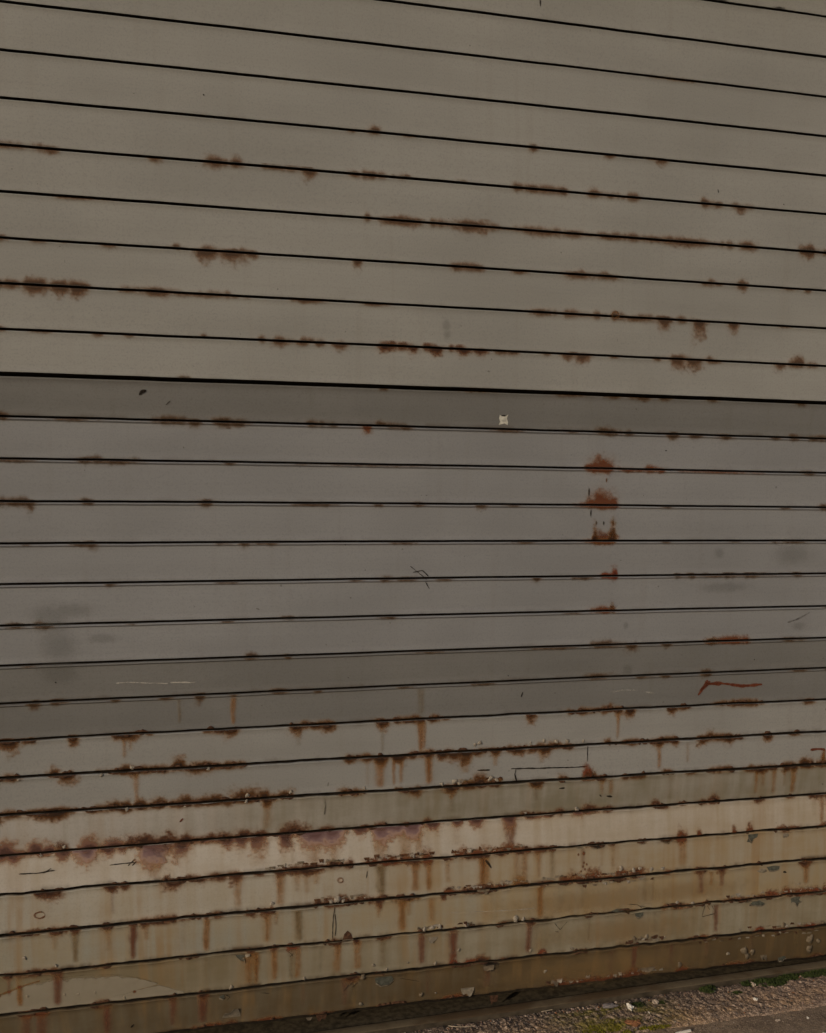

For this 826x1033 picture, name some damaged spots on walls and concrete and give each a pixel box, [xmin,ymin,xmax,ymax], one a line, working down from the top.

rust [534,309,705,337]
rust [378,341,517,357]
rust [579,455,665,545]
rust [566,703,635,722]
rust [108,759,247,776]
rust [344,715,575,797]
rust [604,736,679,775]
rust [696,733,743,747]
rust [686,751,826,799]
rust [0,788,294,823]
rust [651,794,720,809]
rust [662,857,826,941]